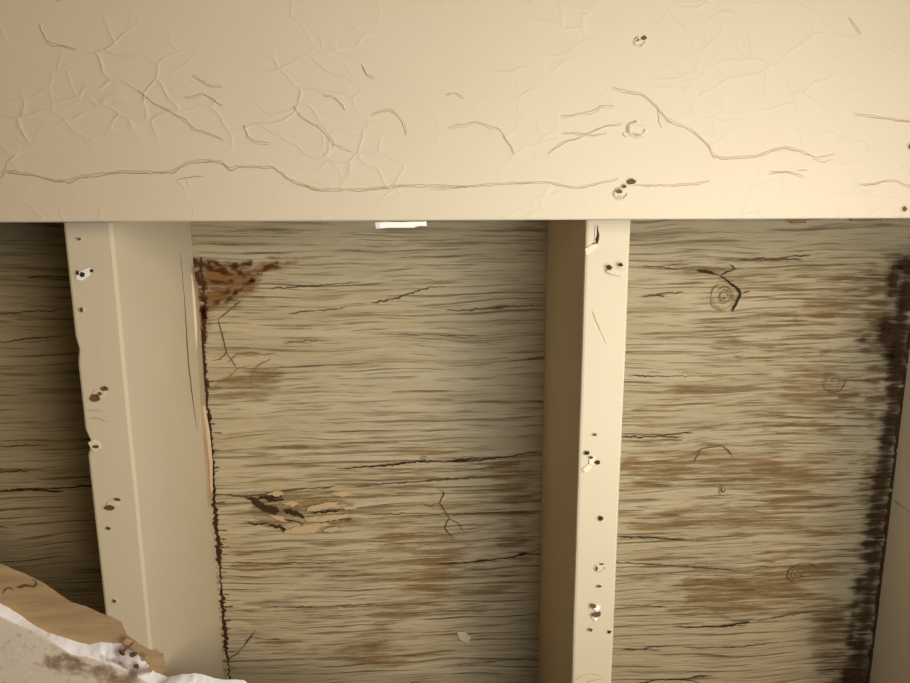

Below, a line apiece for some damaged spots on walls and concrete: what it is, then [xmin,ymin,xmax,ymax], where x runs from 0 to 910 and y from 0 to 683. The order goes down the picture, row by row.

crack [0,74,710,192]
crack [549,87,835,178]
crack [855,113,910,122]
crack [858,179,910,188]
spalling [375,221,427,229]
rust [193,257,291,338]
peeling [90,386,108,402]
crack [180,254,541,679]
damp [621,255,910,683]
spalling [244,491,358,534]
peeling [0,604,247,683]
peeling [589,604,601,632]